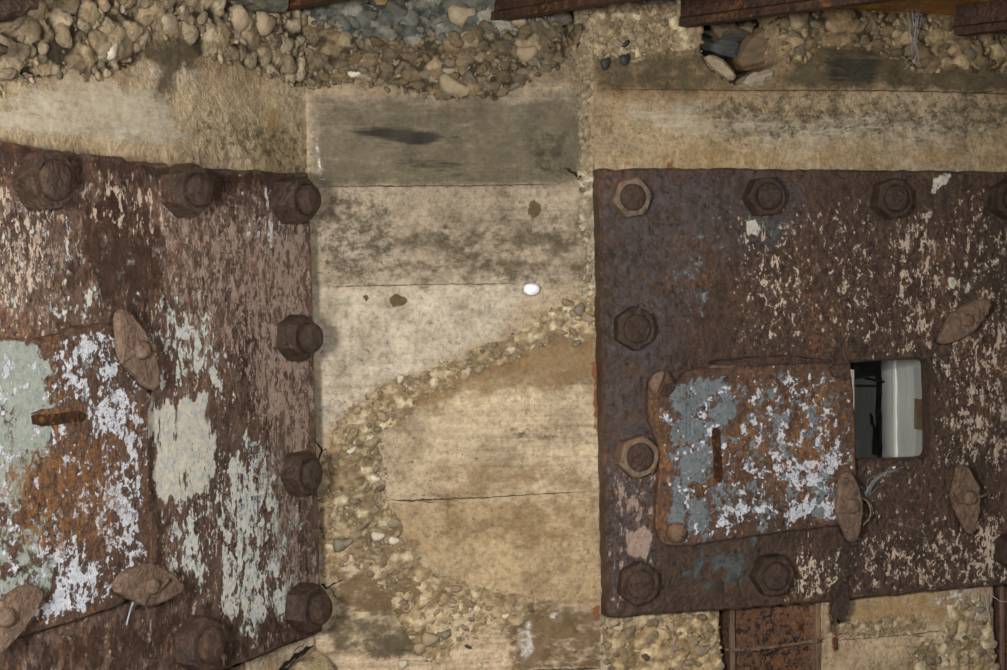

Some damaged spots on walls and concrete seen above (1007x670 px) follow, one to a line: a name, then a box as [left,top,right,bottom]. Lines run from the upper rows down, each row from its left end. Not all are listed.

peeling [0,159,66,335]
peeling [96,168,137,237]
corrosion [67,159,176,328]
corrosion [207,170,295,208]
corrosion [227,296,275,450]
peeling [738,198,1007,465]
corrosion [0,441,129,559]
peeling [72,449,148,571]
peeling [611,479,653,520]
peeling [659,373,841,590]
corrosion [702,383,837,499]
corrosion [4,599,189,670]